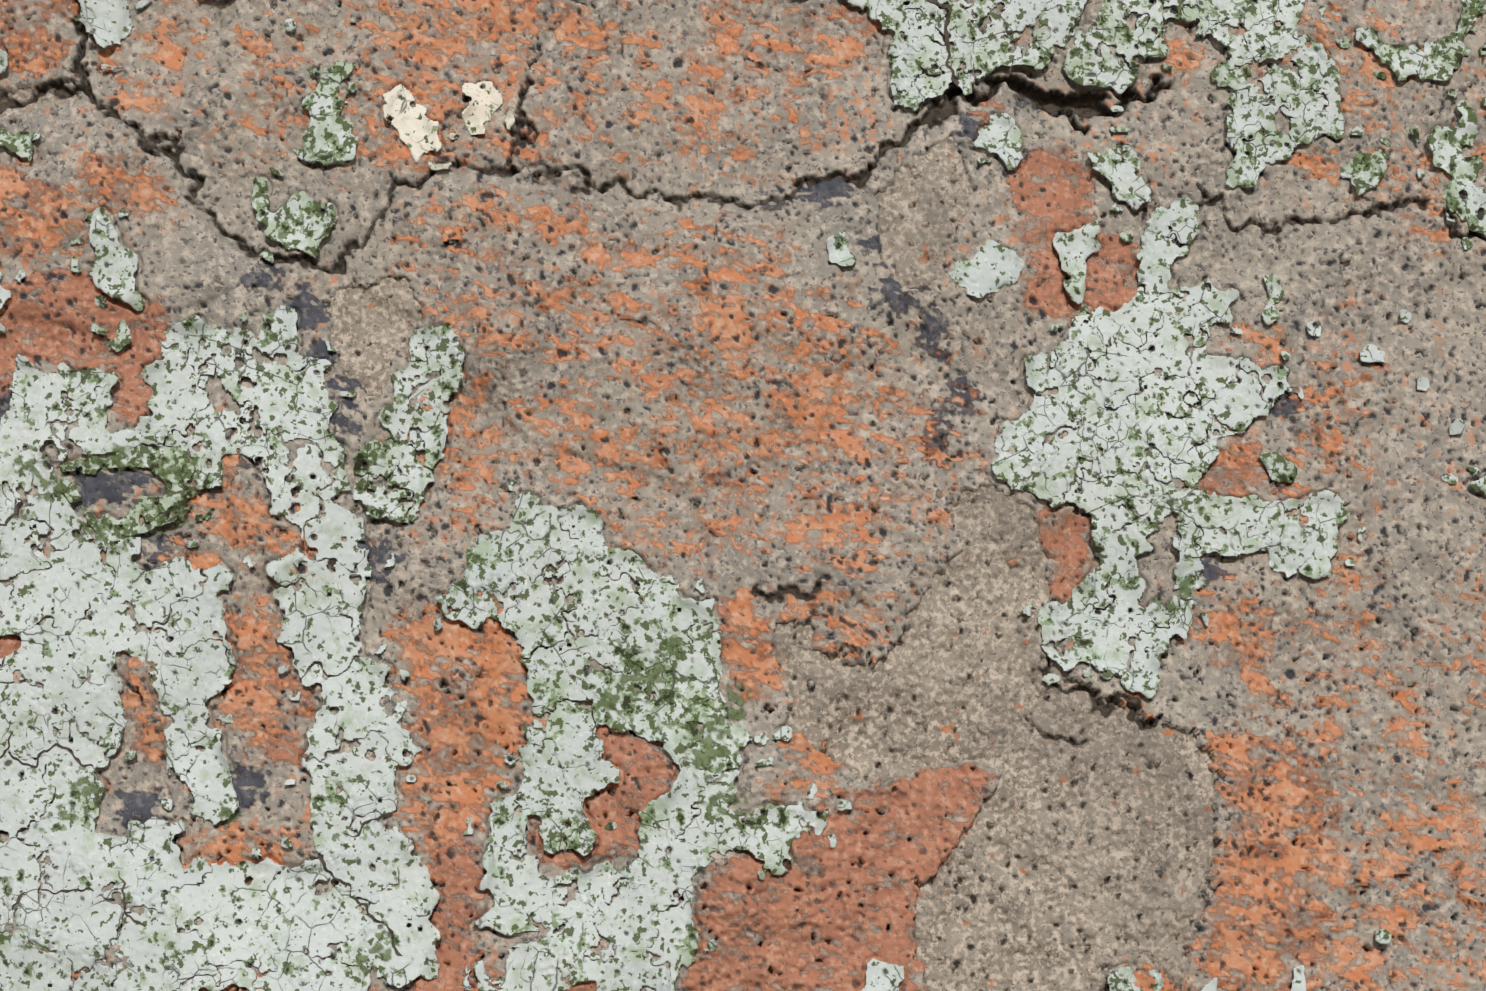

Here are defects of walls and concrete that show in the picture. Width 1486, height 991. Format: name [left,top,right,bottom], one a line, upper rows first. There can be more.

spalling [0,81,80,161]
peeling [281,61,377,180]
peeling [383,67,515,203]
crack [0,0,1171,275]
peeling [242,163,336,263]
crack [1196,183,1486,241]
crack [0,500,18,526]
spalling [423,0,1486,991]
crack [0,731,94,769]
crack [12,873,148,926]
crack [317,812,403,956]